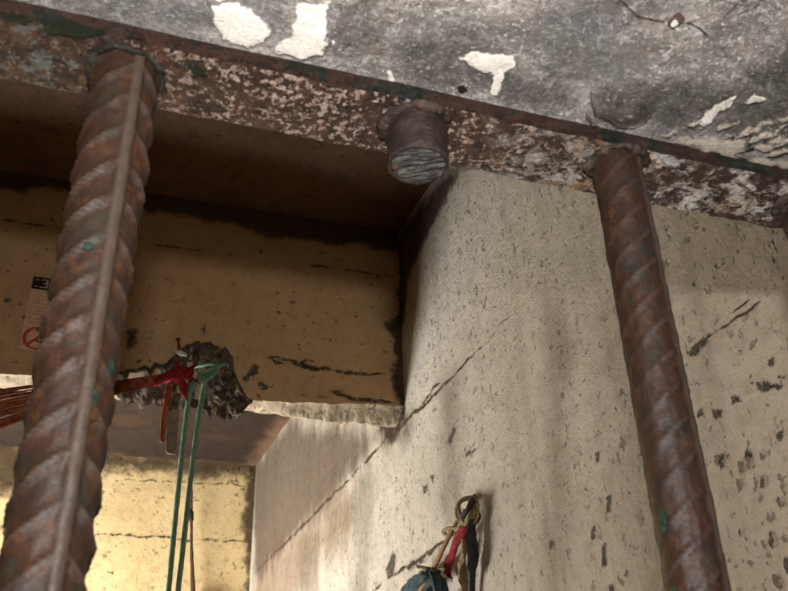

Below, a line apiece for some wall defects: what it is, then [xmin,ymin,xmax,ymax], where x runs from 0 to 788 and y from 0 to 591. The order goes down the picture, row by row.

peeling [211,0,272,48]
peeling [275,1,335,60]
spalling [668,12,685,28]
peeling [460,51,516,96]
peeling [658,95,788,169]
crack [710,299,758,336]
spalling [116,325,268,422]
crack [259,316,510,569]
crack [373,537,452,591]